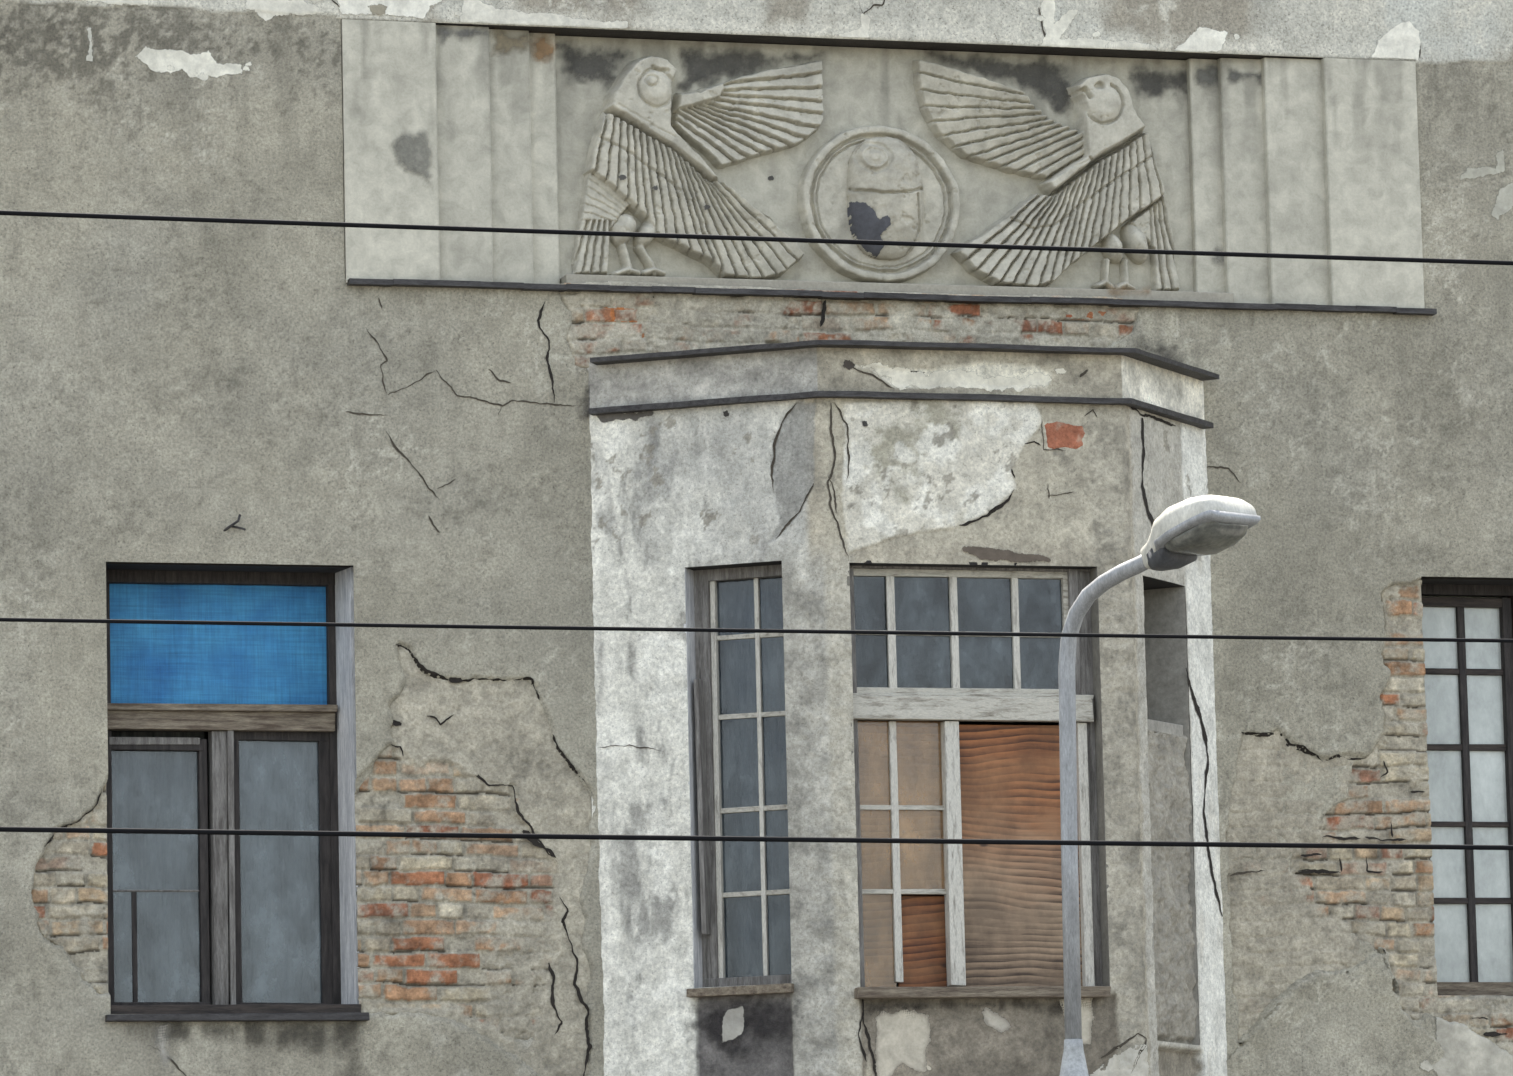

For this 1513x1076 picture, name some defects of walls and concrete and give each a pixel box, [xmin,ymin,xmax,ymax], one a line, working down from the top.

peeling [135,46,252,81]
peeling [246,0,628,29]
crack [346,299,581,533]
crack [770,404,850,555]
spalling [537,281,1139,402]
crack [854,368,925,389]
spalling [31,784,108,994]
spalling [355,644,592,1076]
crack [1186,668,1265,916]
spalling [1226,579,1513,1055]
peeling [875,1009,931,1076]
peeling [1090,1043,1149,1076]